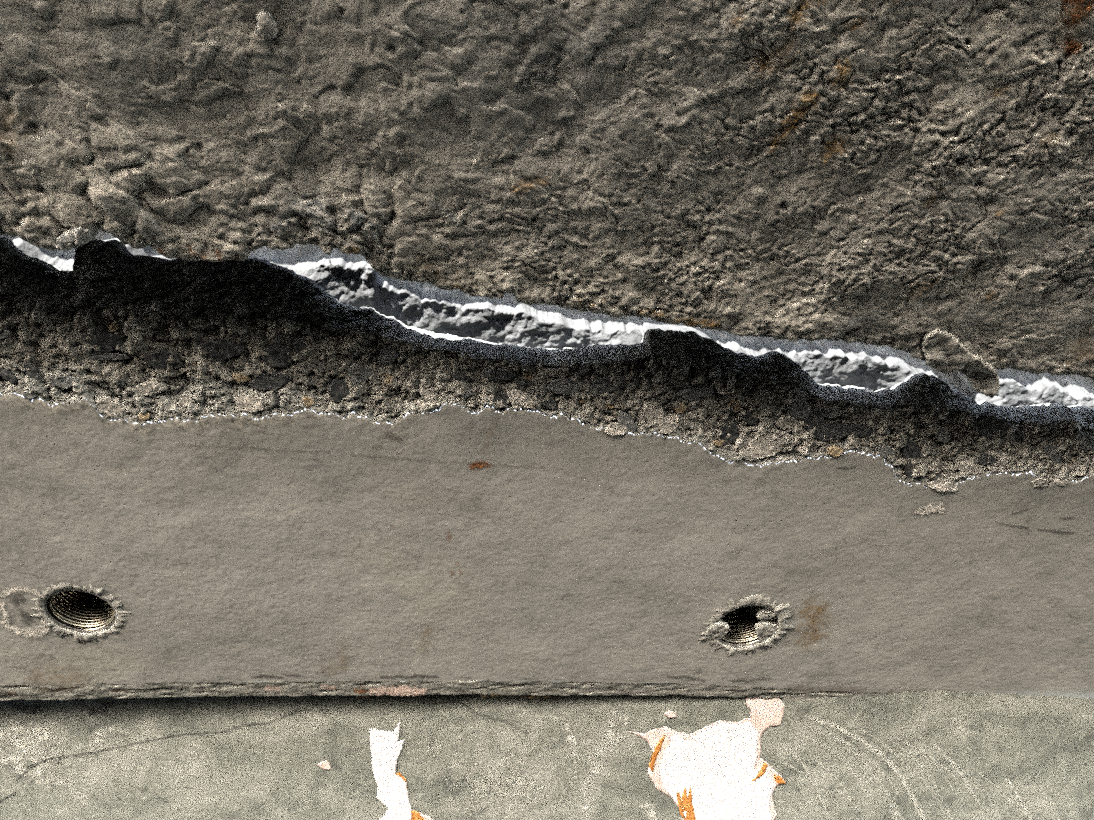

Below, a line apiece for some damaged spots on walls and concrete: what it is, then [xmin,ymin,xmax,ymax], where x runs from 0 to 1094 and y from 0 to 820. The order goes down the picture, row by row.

crack [0,230,176,271]
spalling [270,188,382,238]
spalling [0,237,1094,518]
crack [247,244,1094,408]
peeling [369,722,433,820]
peeling [631,697,786,820]